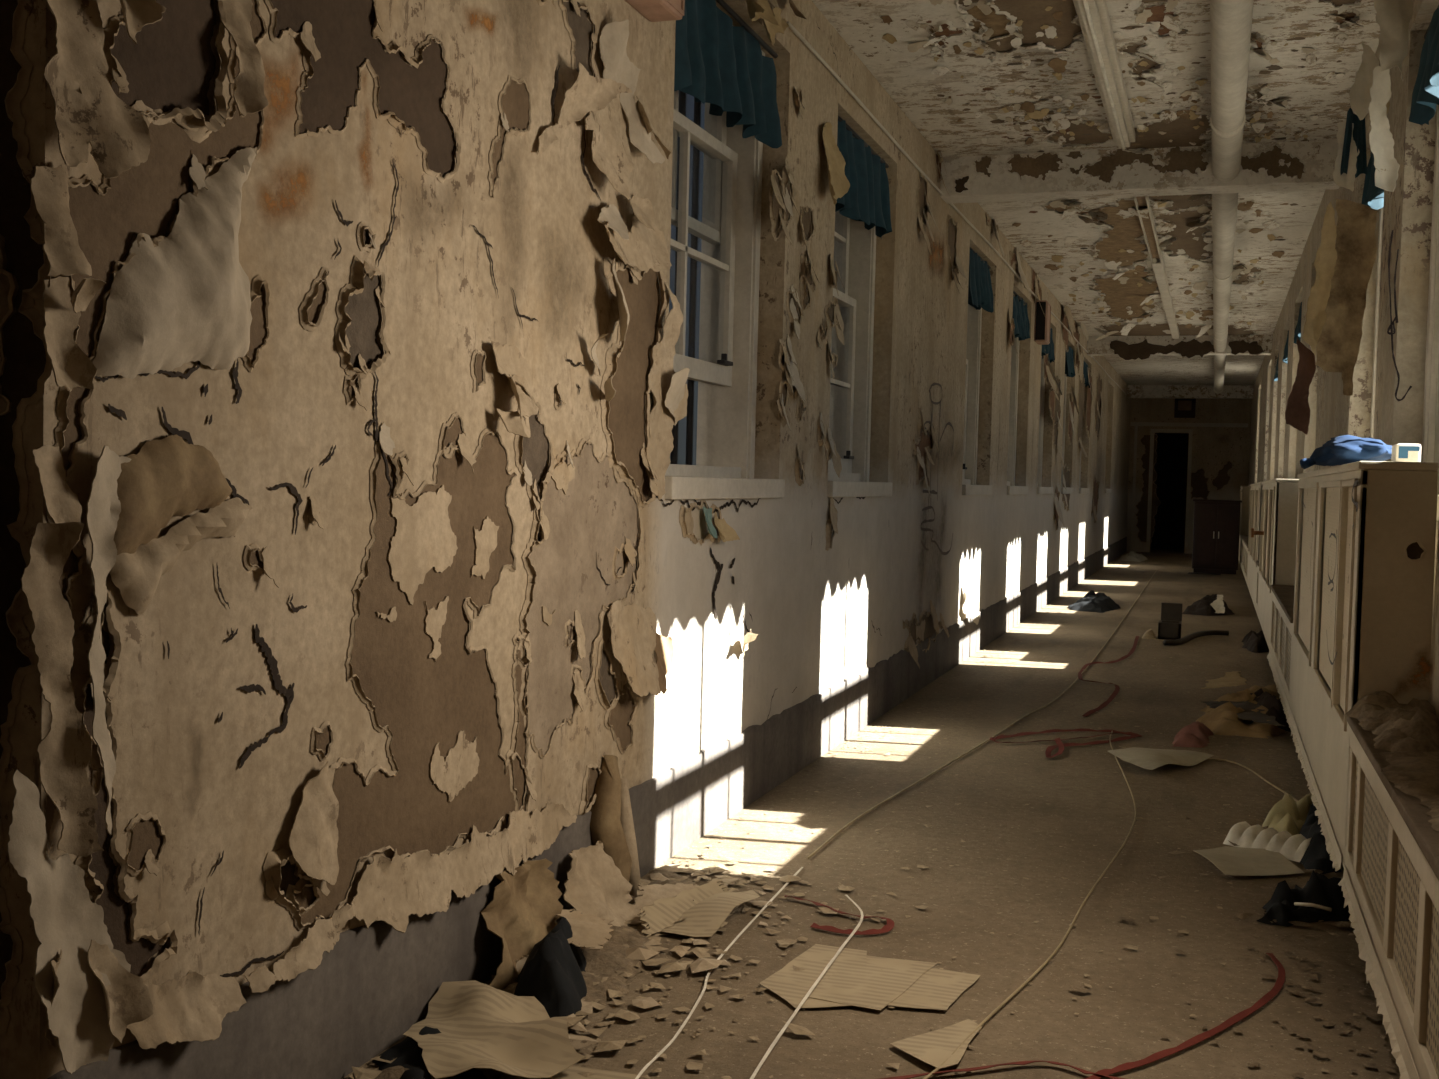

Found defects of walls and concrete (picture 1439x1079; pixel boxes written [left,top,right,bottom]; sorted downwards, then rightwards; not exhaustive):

peeling [822,122,850,205]
peeling [880,0,1306,544]
peeling [769,155,845,486]
peeling [0,0,690,1074]
crack [656,496,761,513]
flaking render [679,499,740,546]
peeling [825,497,838,551]
crack [289,593,307,613]
crack [710,548,753,632]
crack [216,564,295,769]